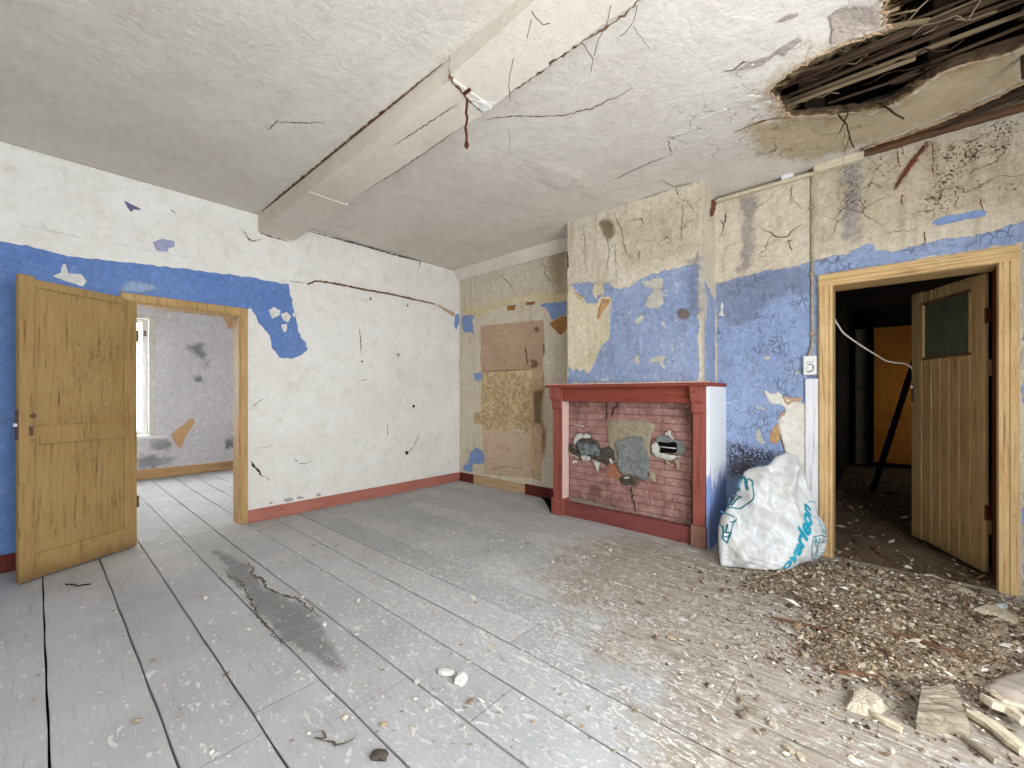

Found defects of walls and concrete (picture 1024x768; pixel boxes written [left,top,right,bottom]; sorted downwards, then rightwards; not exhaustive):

peeling [829,5,878,44]
crack [243,0,640,268]
crack [583,111,881,285]
damp [738,199,754,271]
rust [895,142,935,205]
damp [925,121,1020,212]
crack [292,280,455,317]
peeling [0,241,308,555]
peeling [507,220,1024,510]
damp [729,444,772,477]
damp [224,561,322,647]
flaking render [274,504,762,714]